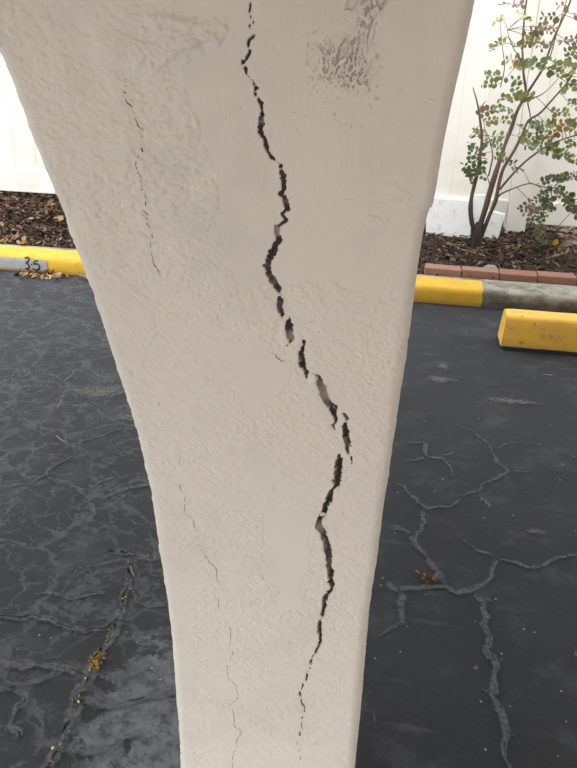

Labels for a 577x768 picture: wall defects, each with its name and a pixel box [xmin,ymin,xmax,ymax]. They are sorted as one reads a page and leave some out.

crack [242,2,353,760]
peeling [305,0,394,128]